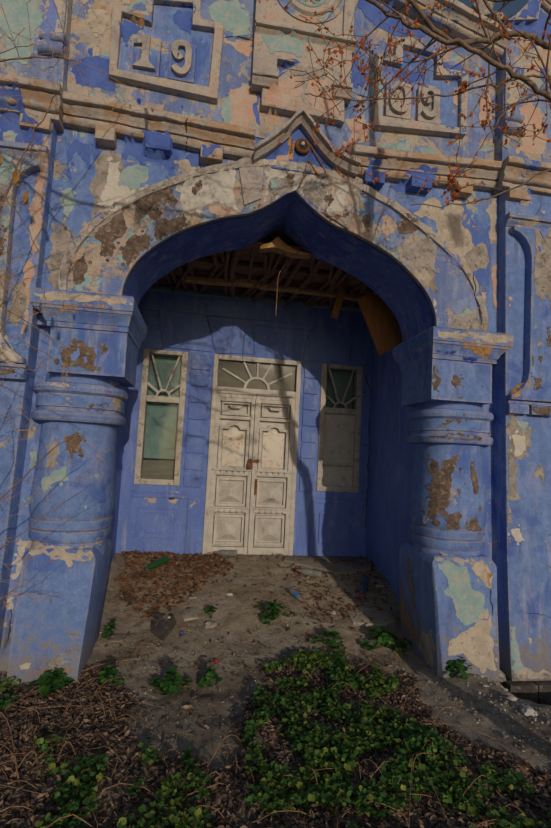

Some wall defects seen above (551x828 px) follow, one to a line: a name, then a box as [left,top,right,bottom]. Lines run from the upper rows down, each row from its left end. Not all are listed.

peeling [0,0,72,65]
peeling [71,0,149,116]
peeling [221,26,383,148]
peeling [358,0,431,38]
peeling [503,66,548,158]
peeling [0,79,239,334]
spalling [253,137,513,361]
spalling [419,453,491,540]
peeling [505,406,551,545]
peeling [10,538,103,580]
peeling [435,552,498,673]
peeling [510,626,551,681]